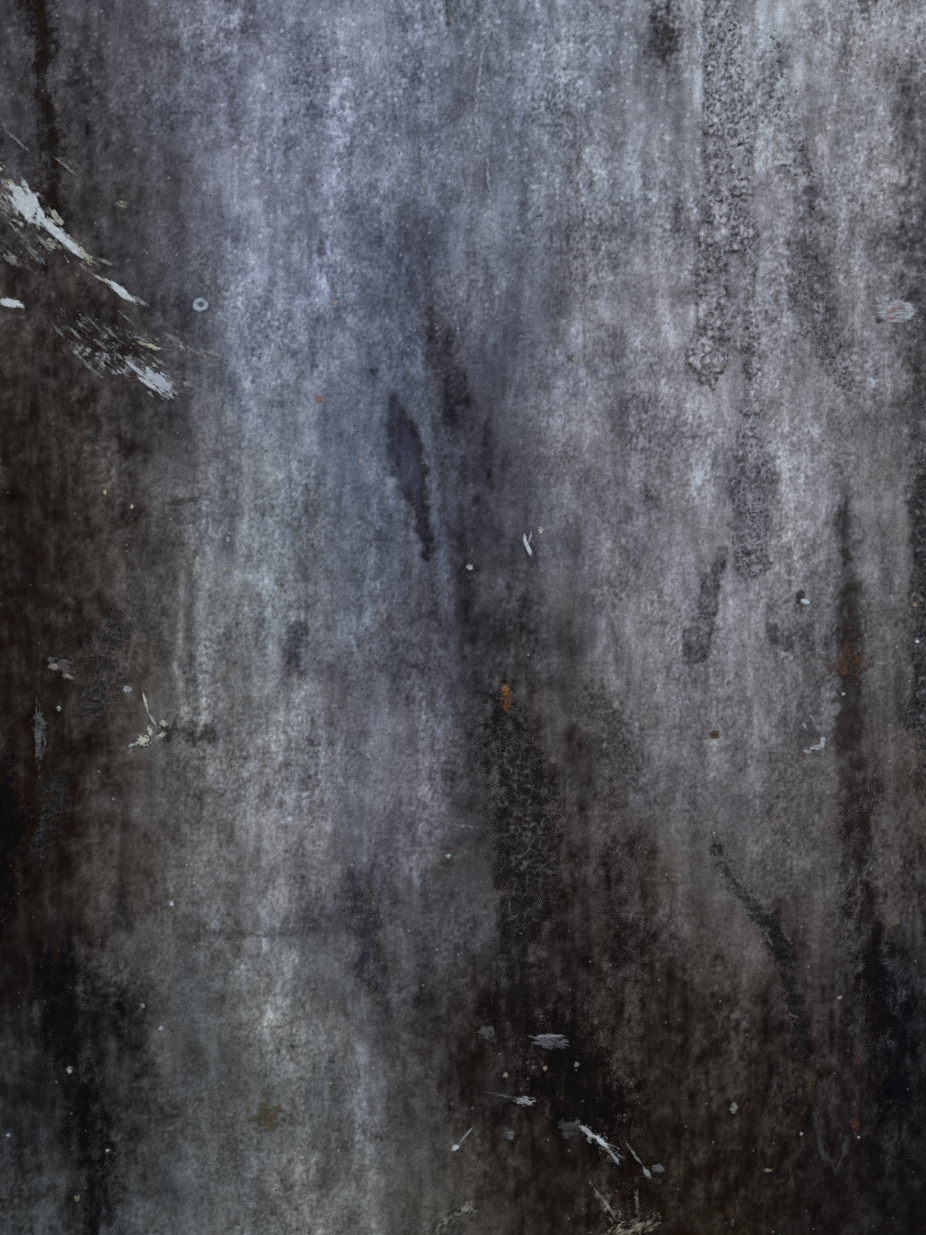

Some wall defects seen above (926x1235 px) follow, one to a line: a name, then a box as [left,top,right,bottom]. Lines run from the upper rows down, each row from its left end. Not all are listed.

leakage [22,0,60,225]
peeling [10,209,112,283]
peeling [89,319,193,394]
peeling [137,333,220,365]
corrosion [499,684,513,712]
leakage [485,695,629,1152]
leakage [37,946,112,1233]